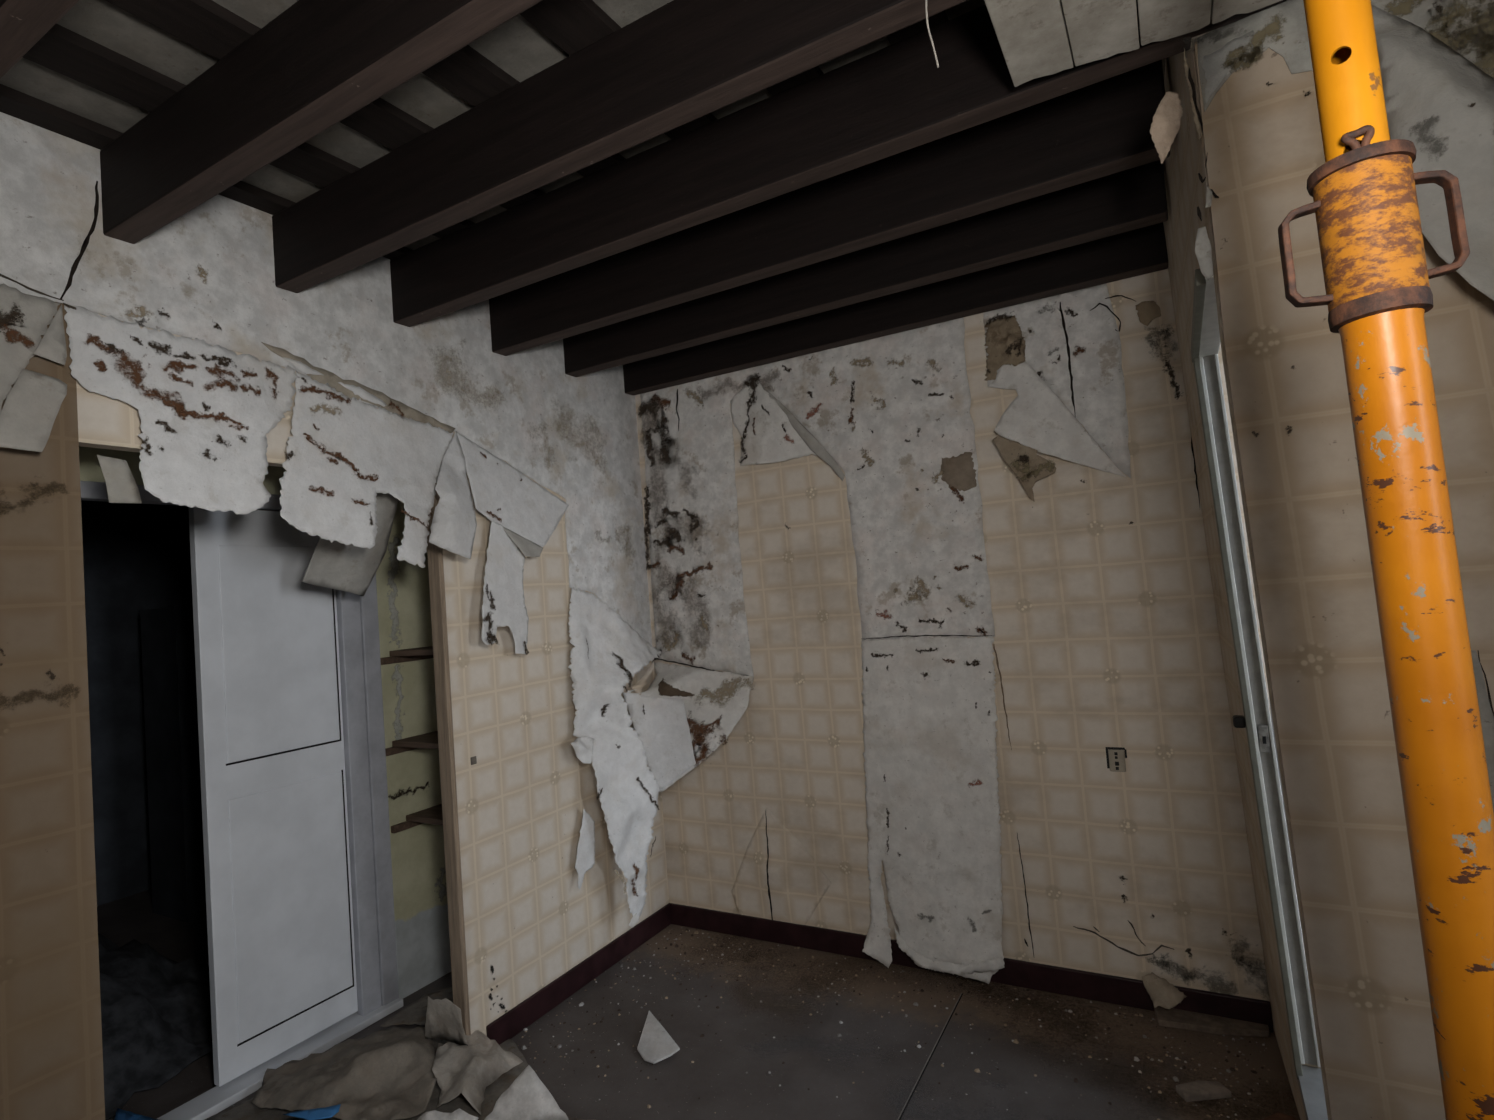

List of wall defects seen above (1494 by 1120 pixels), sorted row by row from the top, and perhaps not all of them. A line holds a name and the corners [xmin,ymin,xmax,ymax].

peeling [1183,0,1313,141]
peeling [1371,0,1494,75]
water stain [1384,0,1494,78]
crack [0,181,99,310]
spalling [1195,227,1214,280]
water stain [0,302,34,348]
peeling [1135,301,1161,326]
peeling [0,112,1131,677]
water stain [638,394,672,467]
water stain [643,487,713,600]
water stain [0,671,78,707]
crack [1478,650,1494,716]